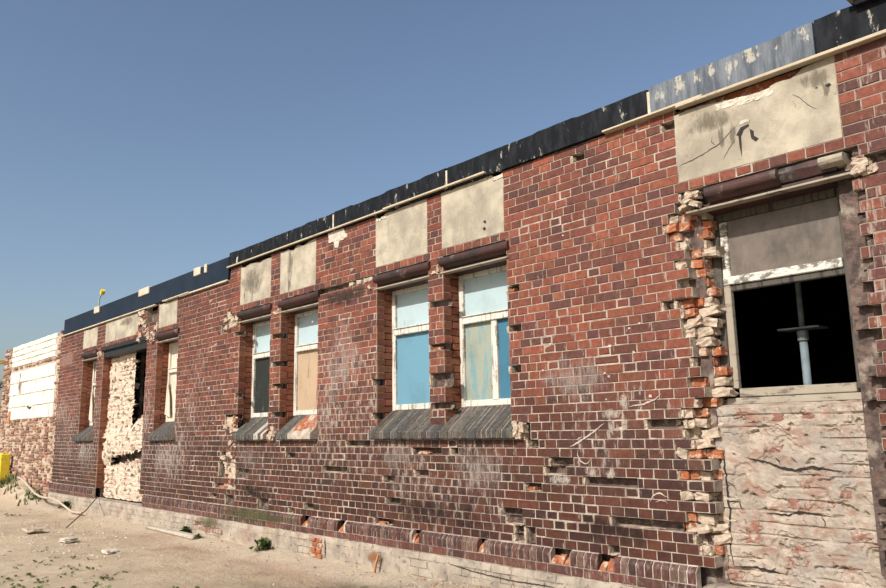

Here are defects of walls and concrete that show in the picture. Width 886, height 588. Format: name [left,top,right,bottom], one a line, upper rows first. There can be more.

spalling [715,88,773,112]
crack [680,128,734,166]
spalling [849,153,886,177]
spalling [661,190,723,319]
spalling [691,346,733,387]
spalling [644,398,724,430]
peeling [736,411,755,420]
peeling [767,413,784,422]
spalling [209,414,249,505]
spalling [689,449,724,459]
spalling [499,507,536,544]
peeling [739,520,764,544]